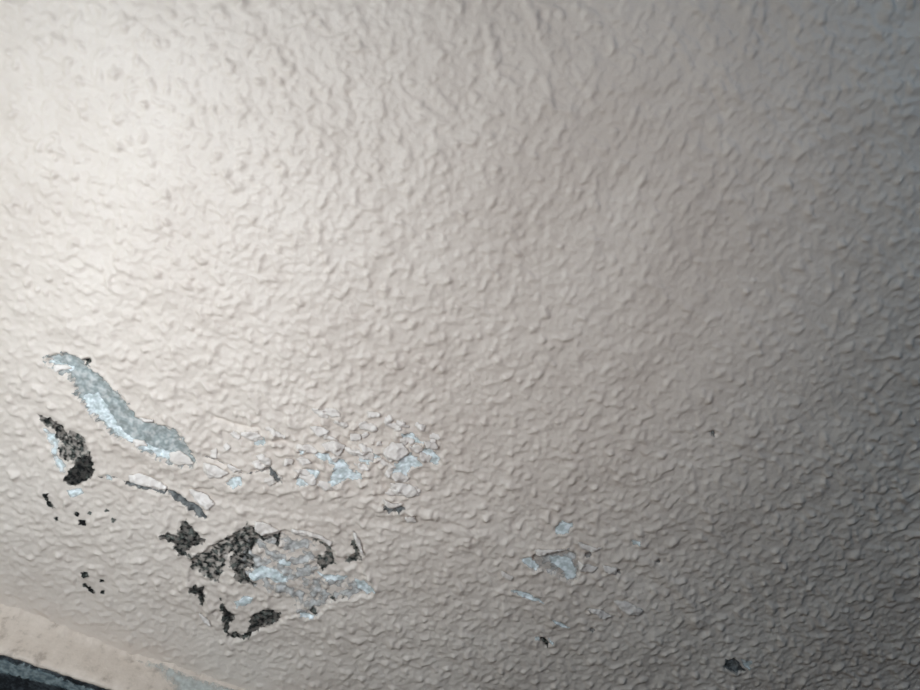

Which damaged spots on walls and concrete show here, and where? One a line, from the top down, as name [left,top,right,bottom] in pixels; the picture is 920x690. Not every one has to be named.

peeling [44,352,440,523]
flaking render [159,521,375,640]
peeling [522,542,620,579]